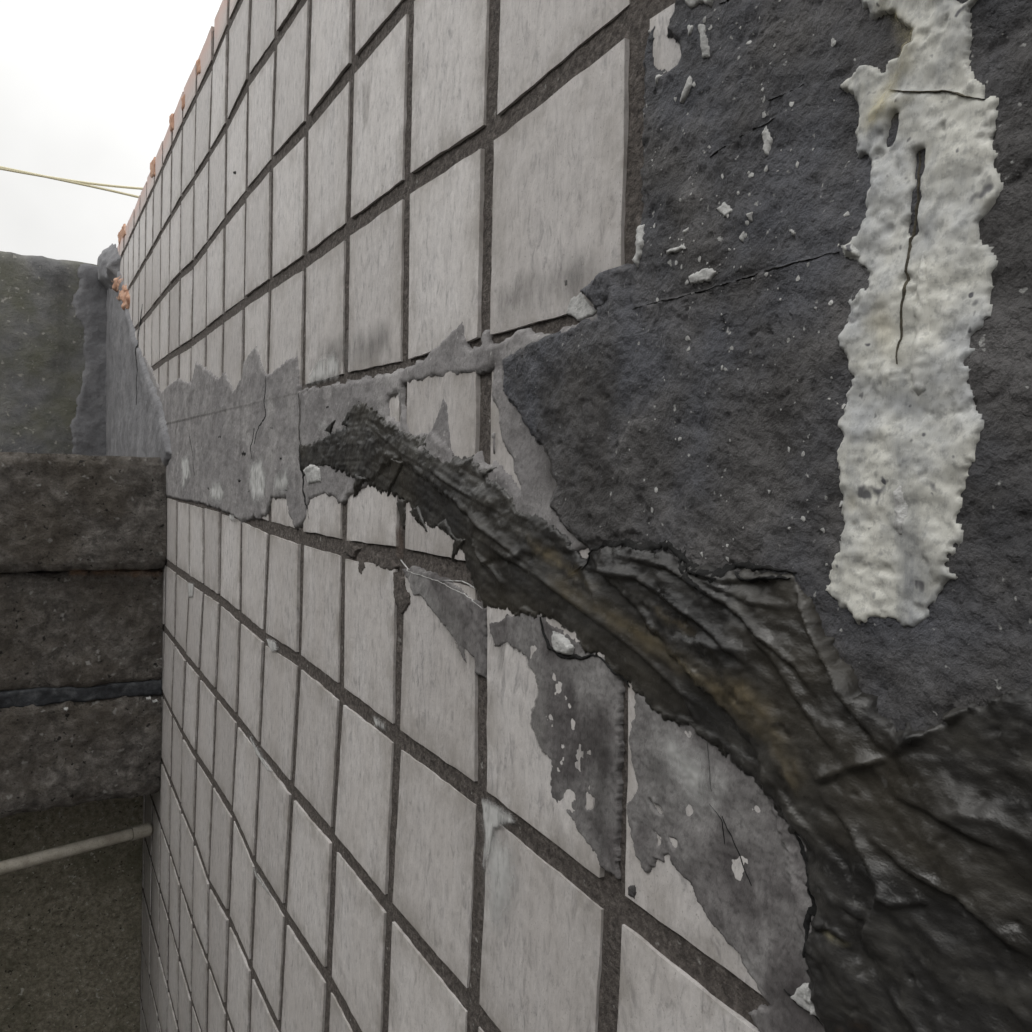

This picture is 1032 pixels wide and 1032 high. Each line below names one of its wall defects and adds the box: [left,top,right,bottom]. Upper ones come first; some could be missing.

peeling [676,0,721,59]
peeling [674,76,696,103]
peeling [747,84,799,178]
peeling [714,195,733,218]
peeling [632,223,695,267]
spalling [580,268,613,310]
peeling [685,256,718,304]
crack [634,252,839,309]
peeling [825,0,1003,628]
spalling [303,464,321,484]
spalling [551,631,575,655]
damp [482,801,512,916]